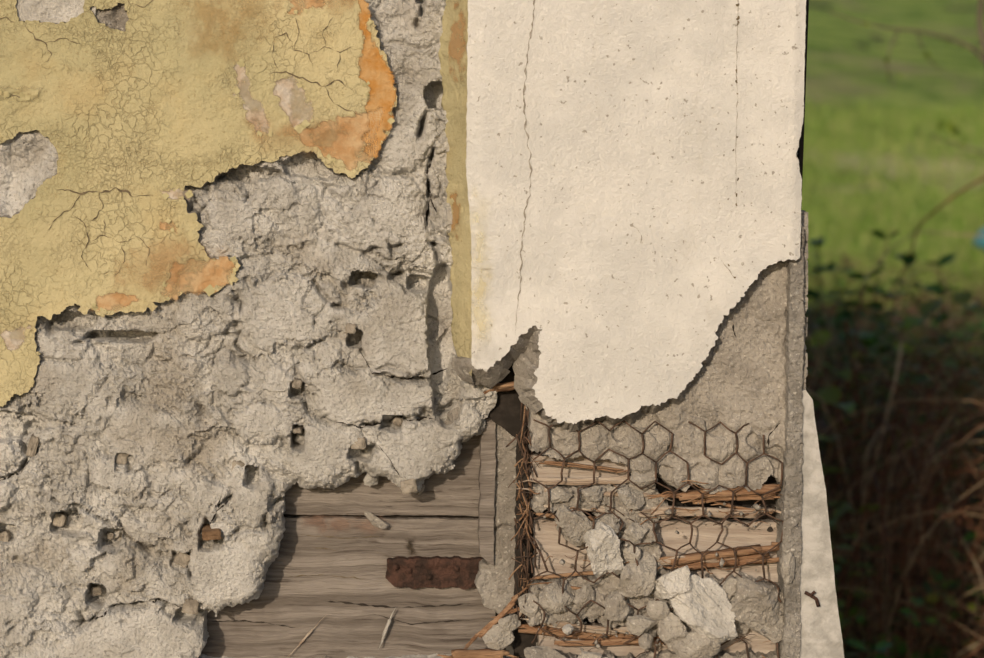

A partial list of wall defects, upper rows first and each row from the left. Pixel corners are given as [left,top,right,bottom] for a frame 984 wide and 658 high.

crack [272,18,359,115]
crack [515,0,535,325]
flaking render [0,0,499,658]
flaking render [527,262,788,494]
flaking render [801,210,809,390]